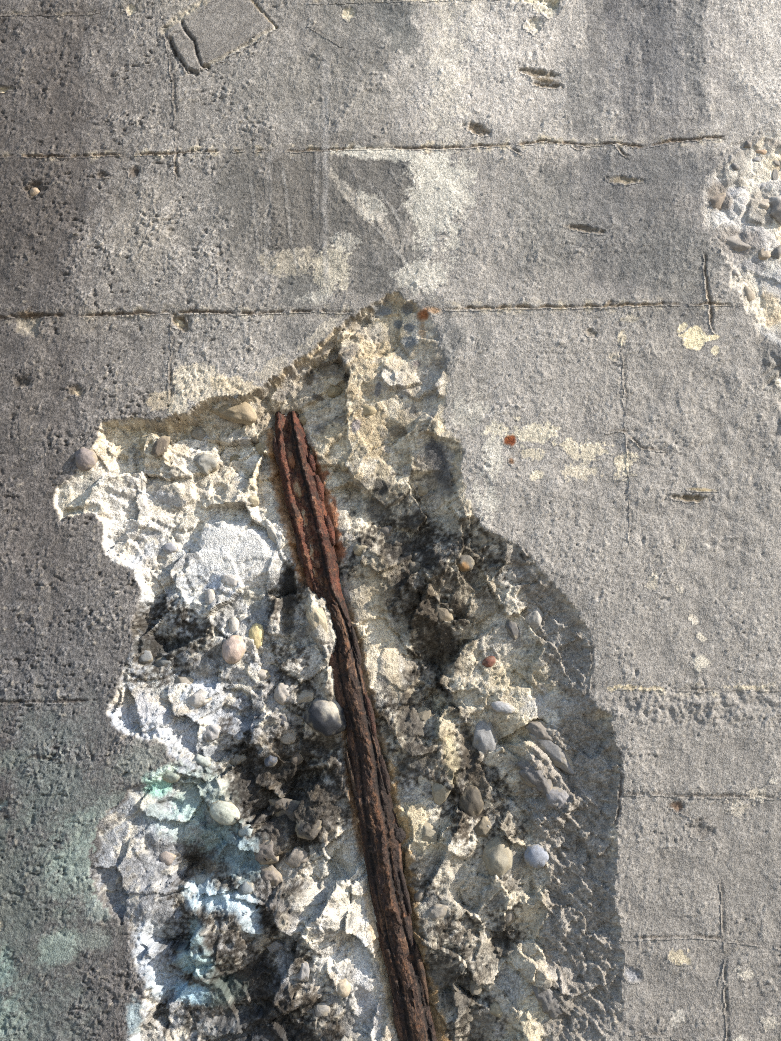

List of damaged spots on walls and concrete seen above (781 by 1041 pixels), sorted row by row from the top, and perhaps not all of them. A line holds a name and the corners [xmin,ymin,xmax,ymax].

spalling [55,0,646,1041]
rust [262,411,459,1041]
peeling [688,614,711,672]
spalling [702,121,781,423]